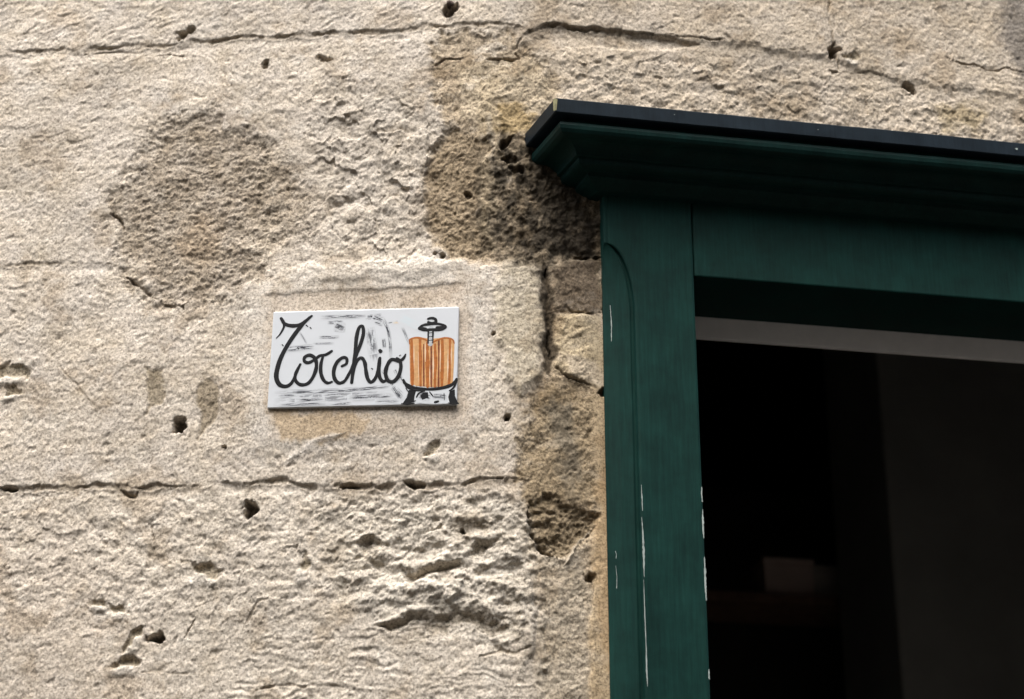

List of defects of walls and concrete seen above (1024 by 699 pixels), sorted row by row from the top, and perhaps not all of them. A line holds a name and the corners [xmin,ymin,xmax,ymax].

leakage [462,134,601,513]
spalling [292,483,593,657]